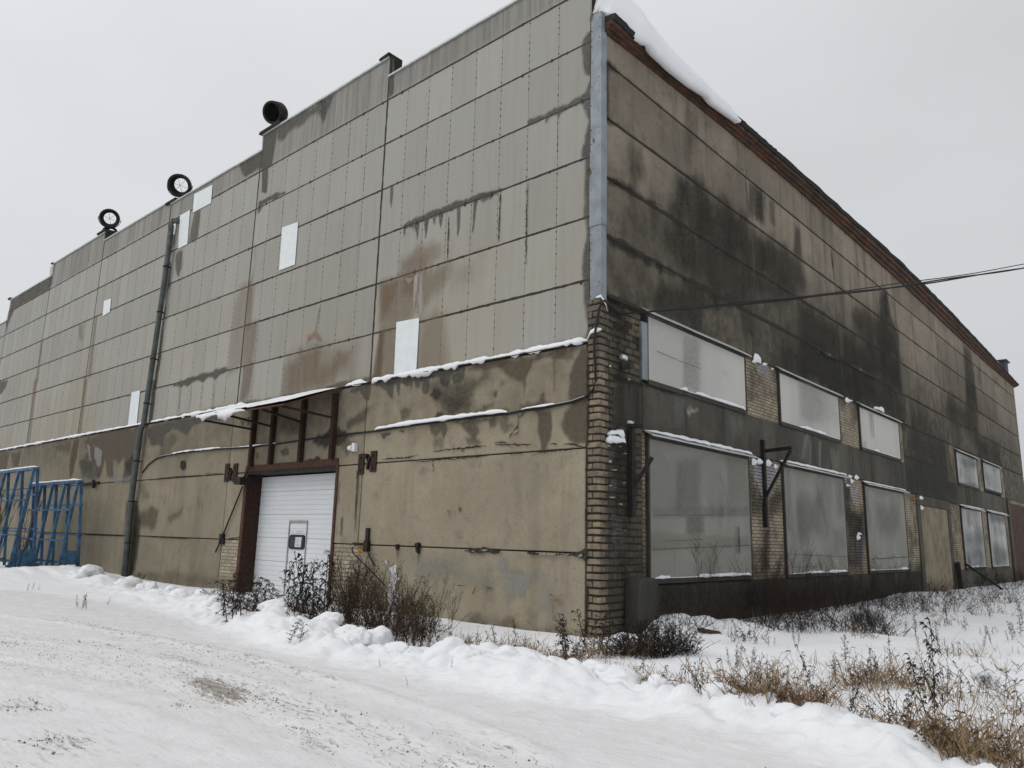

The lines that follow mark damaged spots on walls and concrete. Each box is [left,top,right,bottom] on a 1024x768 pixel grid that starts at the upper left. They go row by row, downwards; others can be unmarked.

water stain [240,96,333,213]
water stain [404,189,500,238]
water stain [528,32,591,319]
water stain [656,180,803,329]
water stain [308,424,351,461]
rust [379,330,393,376]
water stain [327,348,589,450]
water stain [785,294,905,424]
water stain [948,349,999,459]